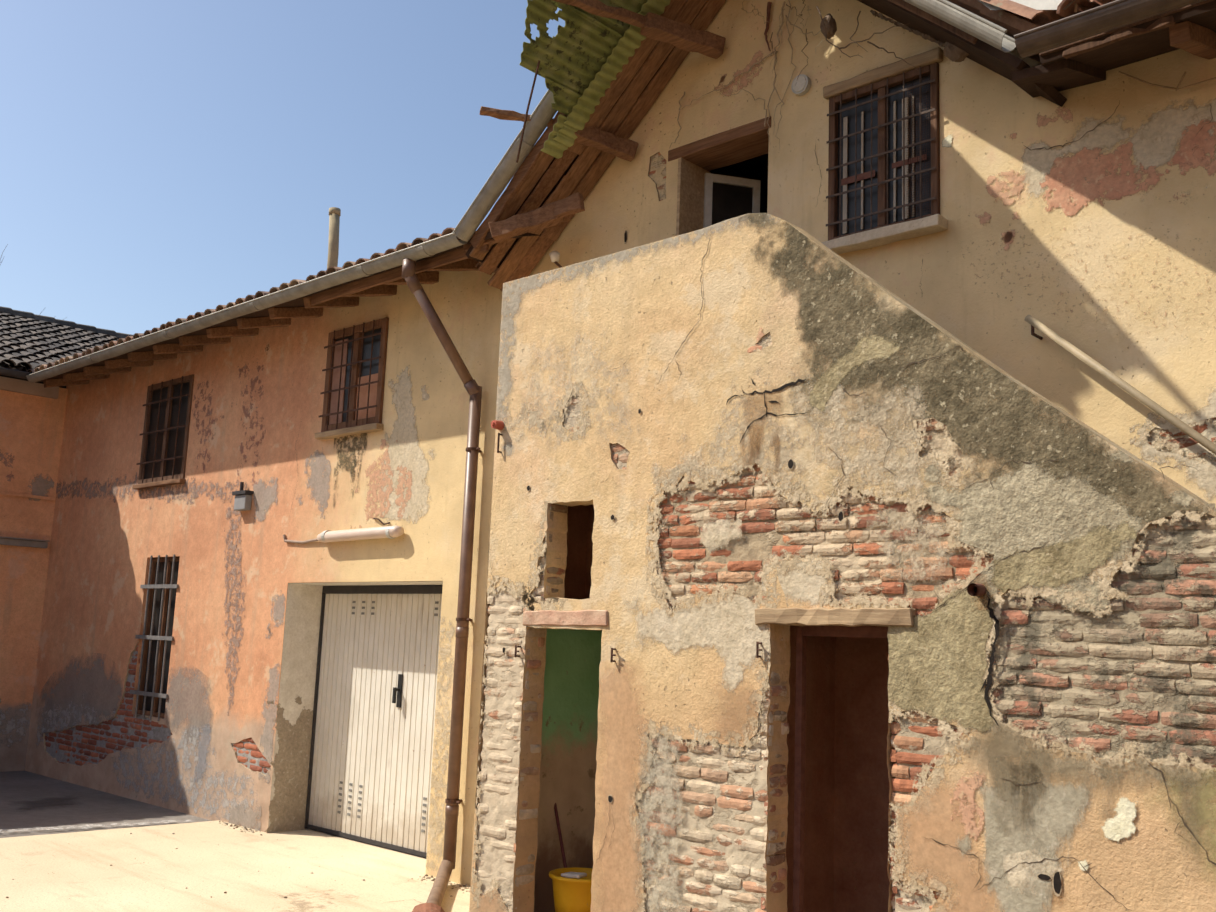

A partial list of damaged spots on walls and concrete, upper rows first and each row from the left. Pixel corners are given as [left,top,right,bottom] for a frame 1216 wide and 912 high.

peeling [961,99,1216,339]
peeling [351,367,434,528]
flaking render [611,443,630,470]
crack [651,228,711,393]
crack [726,379,807,444]
leakage [740,213,1202,523]
flaking render [45,643,173,766]
peeling [232,696,313,833]
flaking render [624,411,1216,912]
crack [913,538,1055,725]
crack [926,838,1132,911]
leakage [959,722,1120,912]